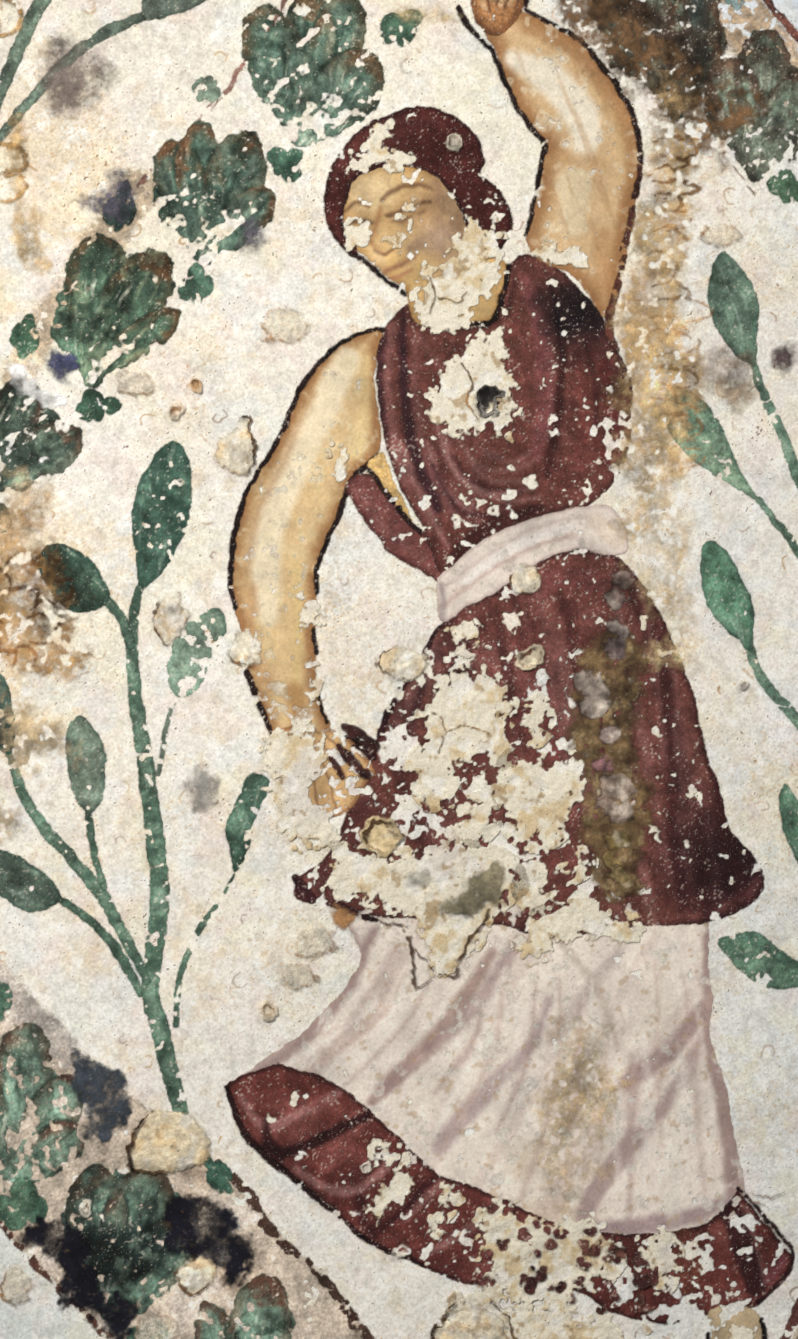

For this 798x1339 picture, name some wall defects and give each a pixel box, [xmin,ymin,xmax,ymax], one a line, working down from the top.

peeling [346,119,416,174]
spalling [447,133,462,152]
peeling [344,198,416,251]
spalling [523,237,589,268]
spalling [409,214,523,443]
peeling [325,441,349,482]
peeling [296,591,326,627]
water stain [568,571,684,902]
spalling [258,621,646,977]
peeling [360,1139,415,1226]
spalling [393,1244,411,1258]
peeling [427,1182,685,1339]